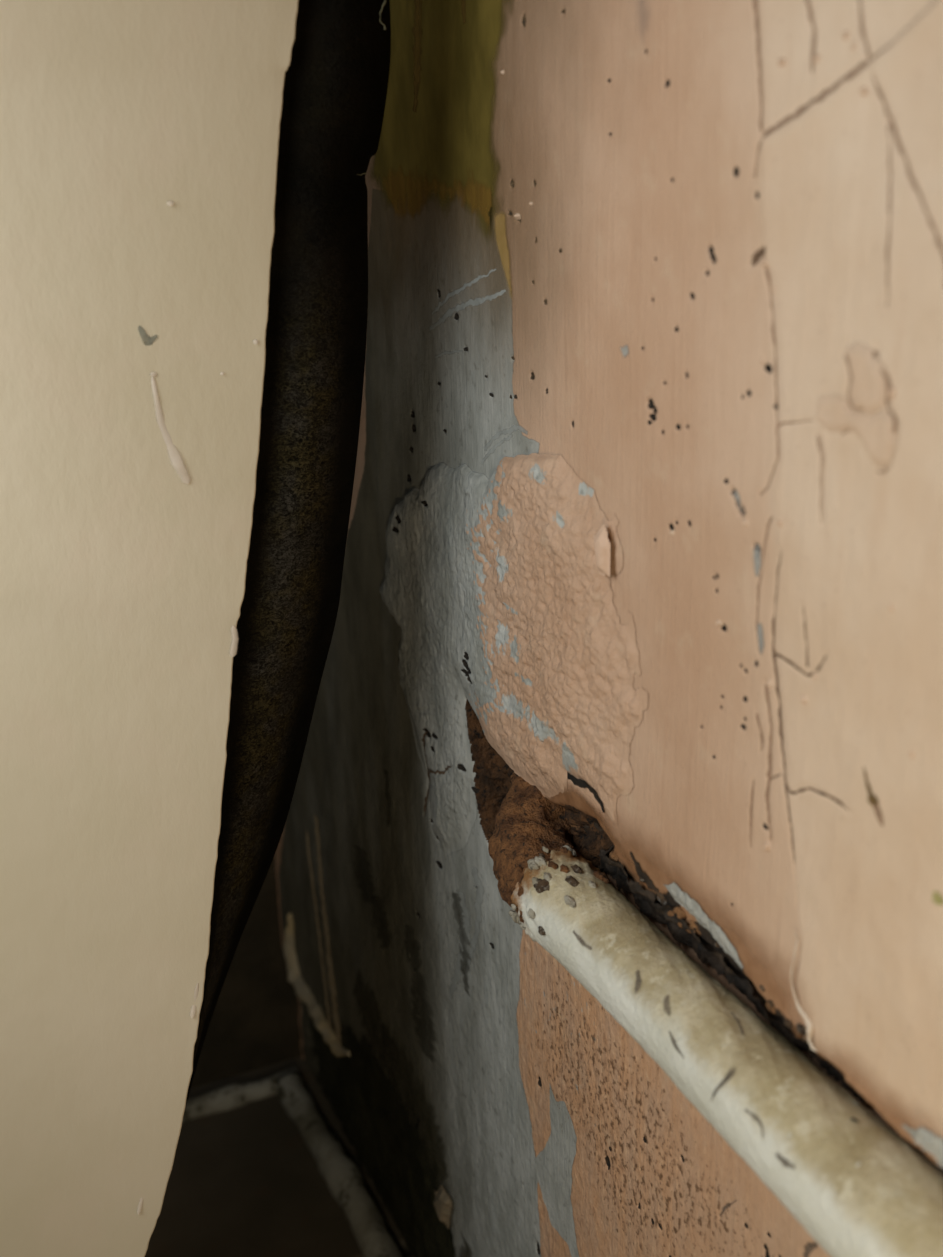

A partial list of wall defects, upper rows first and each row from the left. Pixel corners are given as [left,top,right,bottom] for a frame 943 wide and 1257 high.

leakage [372,0,511,293]
crack [753,0,943,306]
crack [750,247,849,863]
peeling [278,188,579,1257]
spalling [544,797,615,874]